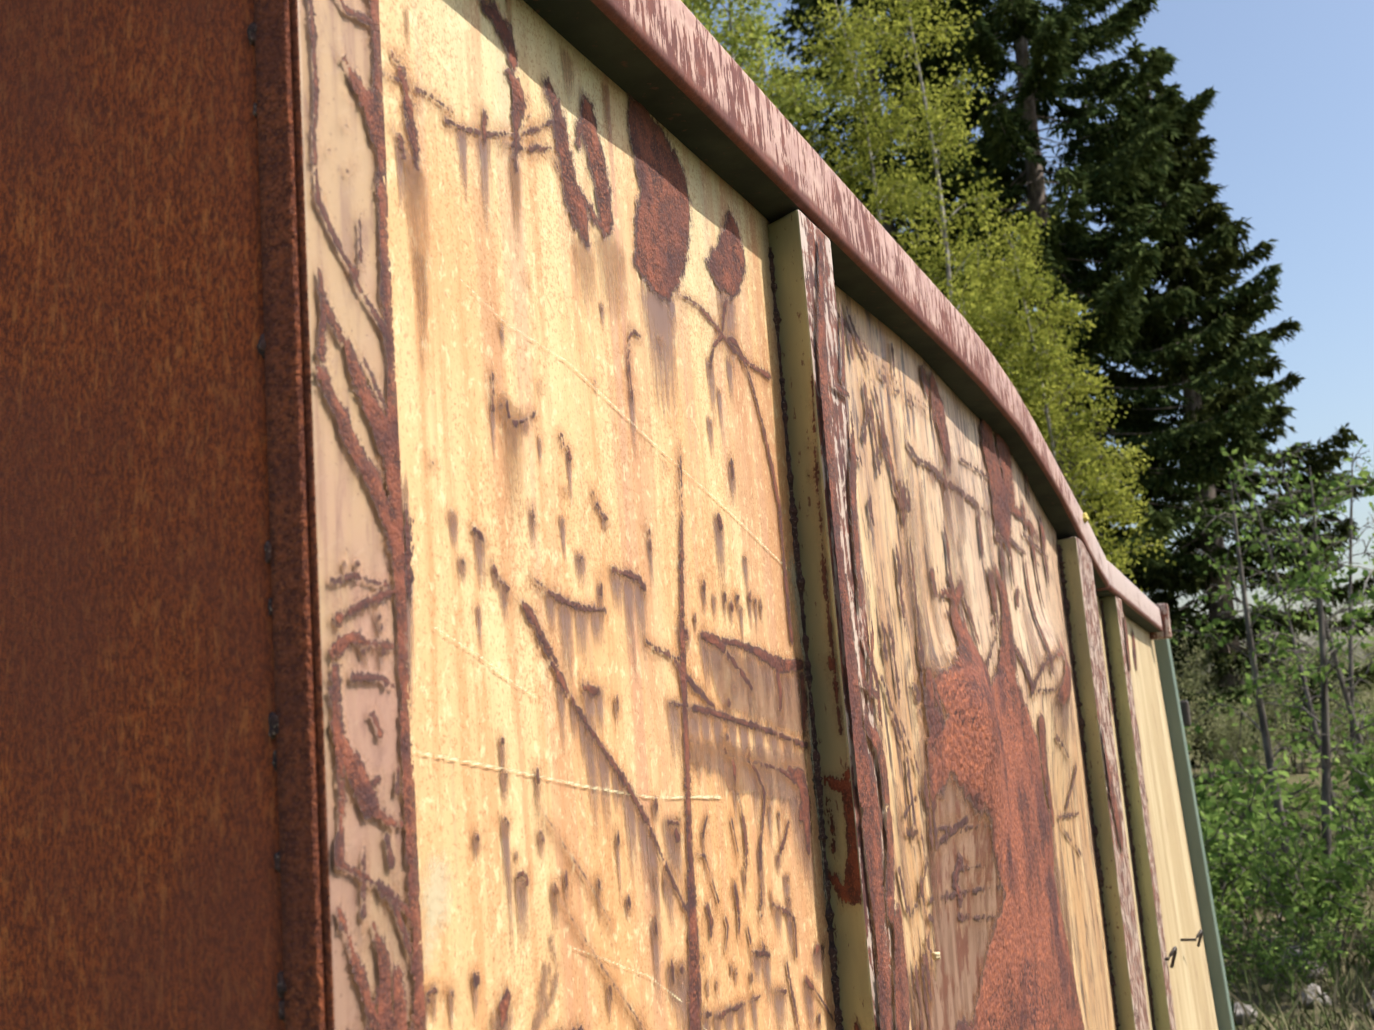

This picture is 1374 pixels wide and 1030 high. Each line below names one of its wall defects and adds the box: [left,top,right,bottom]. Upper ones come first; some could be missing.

rust [341,51,427,313]
rust [481,0,530,215]
rust [544,53,746,449]
rust [316,268,415,870]
rust [559,517,585,576]
rust [714,513,725,570]
rust [669,556,862,906]
rust [833,309,1085,1030]
rust [336,903,454,1030]
rust [492,987,513,1030]
rust [652,916,686,1002]
rust [701,941,771,1030]